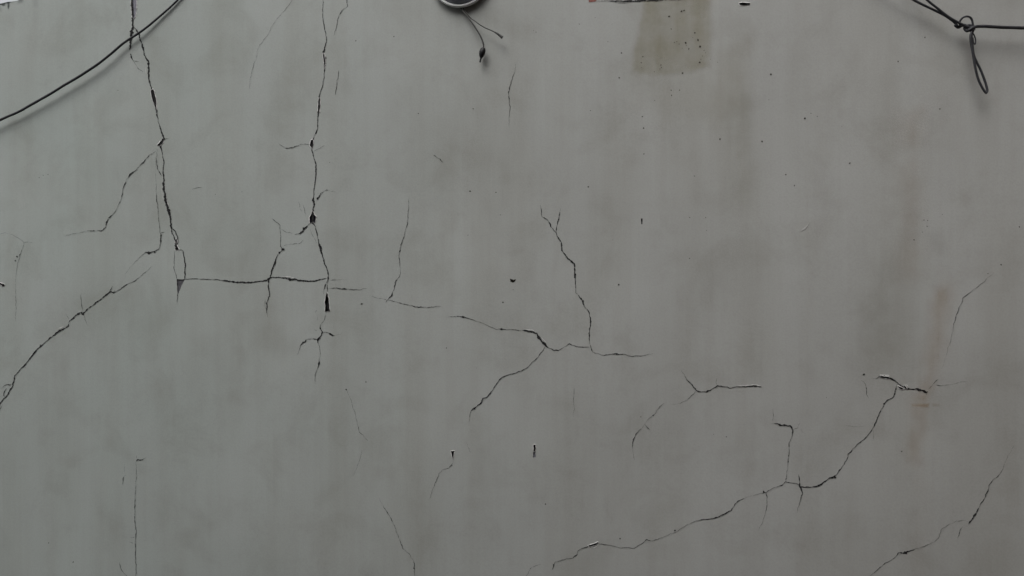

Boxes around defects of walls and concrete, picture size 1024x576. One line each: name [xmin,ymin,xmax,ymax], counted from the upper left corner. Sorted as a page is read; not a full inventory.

crack [589,0,662,8]
crack [0,0,648,420]
crack [528,281,985,573]
crack [874,446,1014,573]